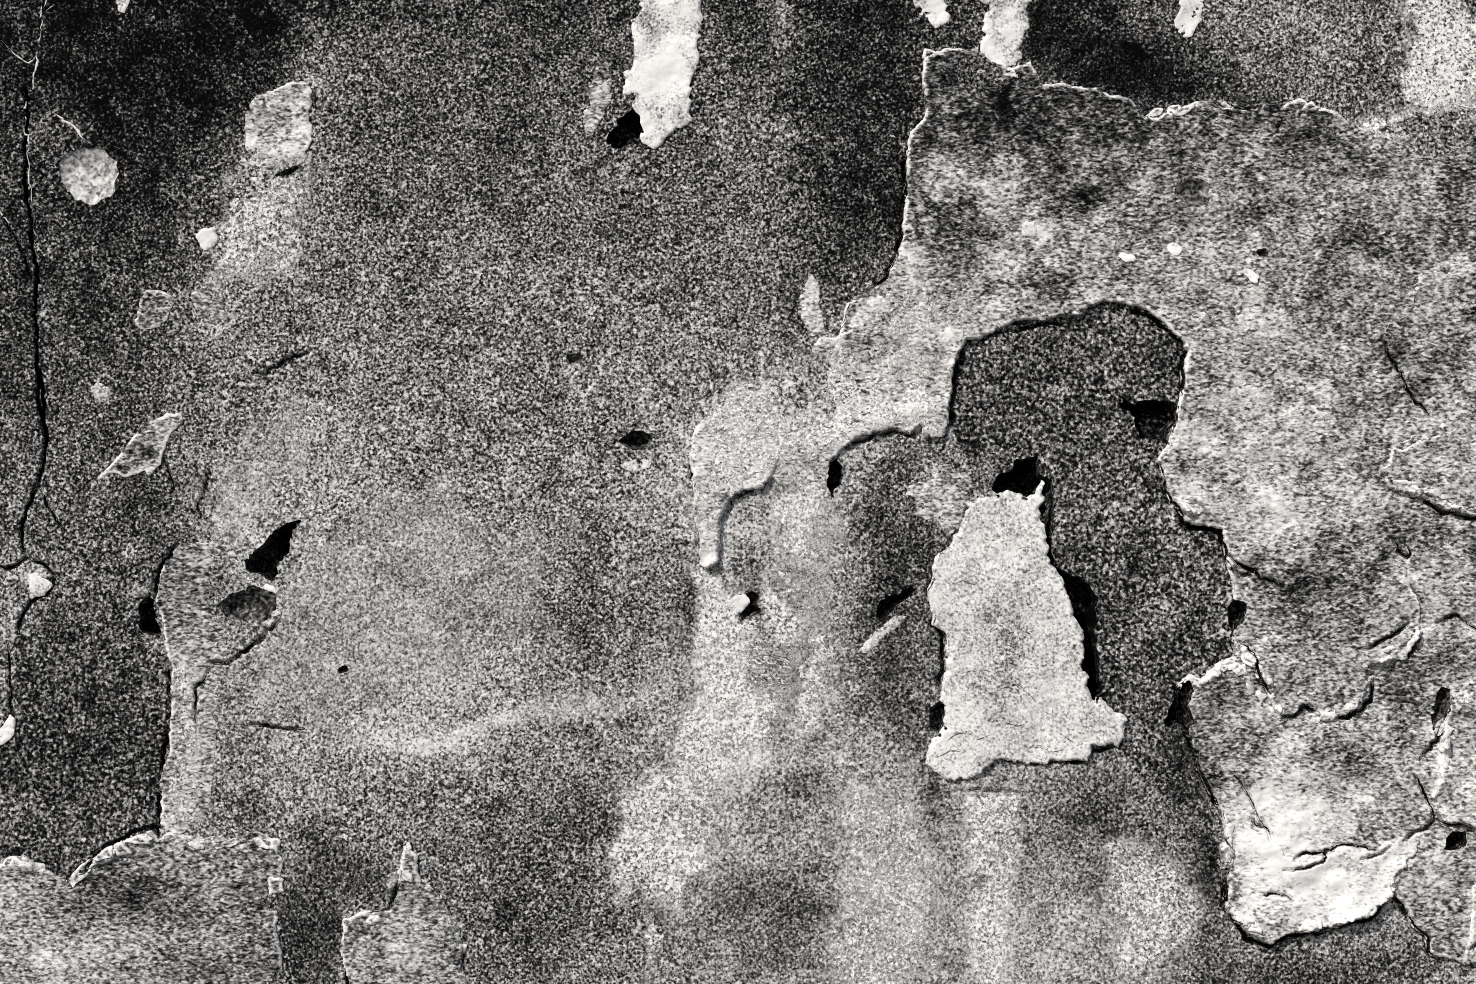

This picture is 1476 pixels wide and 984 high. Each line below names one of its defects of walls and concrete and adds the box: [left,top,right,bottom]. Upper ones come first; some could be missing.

peeling [583,0,703,149]
peeling [965,0,1032,78]
leakage [209,156,311,284]
crack [0,0,87,715]
crack [1384,315,1431,448]
spalling [799,267,1423,789]
crack [1241,643,1272,694]
crack [1365,614,1476,649]
peeling [0,541,284,984]
peeling [340,842,468,984]
peeling [1216,816,1422,944]
crack [1237,731,1476,901]